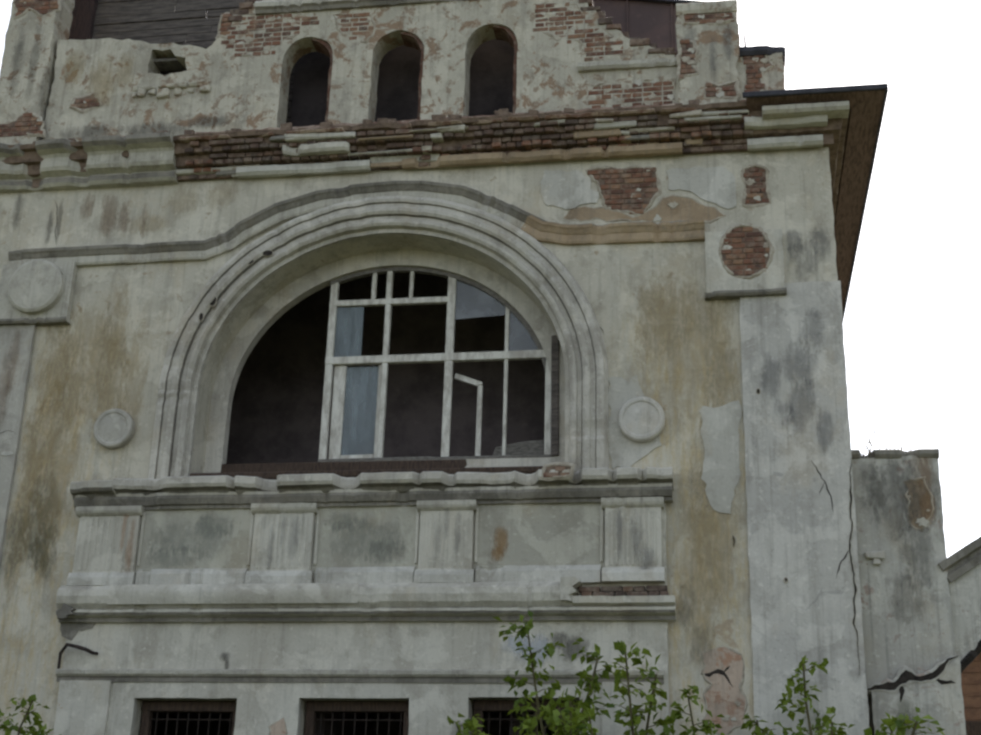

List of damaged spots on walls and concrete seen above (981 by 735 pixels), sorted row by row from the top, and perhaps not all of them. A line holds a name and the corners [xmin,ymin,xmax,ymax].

spalling [11,0,61,20]
spalling [215,12,319,57]
spalling [331,12,376,44]
spalling [533,2,623,62]
spalling [0,110,46,137]
spalling [563,164,775,279]
flaking render [904,476,935,532]
crack [811,460,959,702]
flaking render [701,646,748,735]